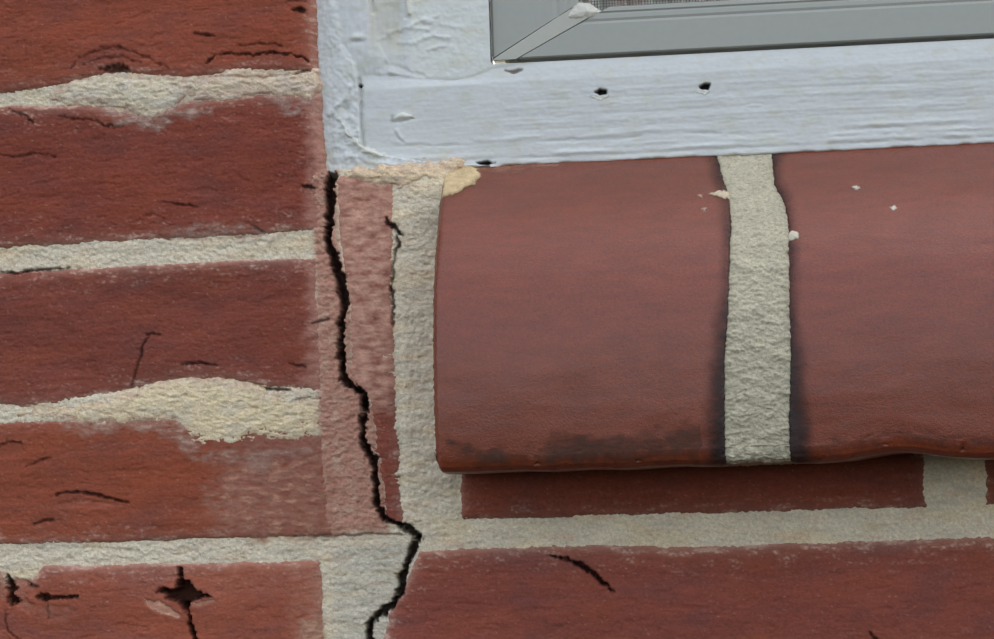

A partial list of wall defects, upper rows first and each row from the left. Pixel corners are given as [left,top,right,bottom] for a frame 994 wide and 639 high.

crack [314,174,422,639]
crack [57,491,124,506]
crack [552,556,612,590]